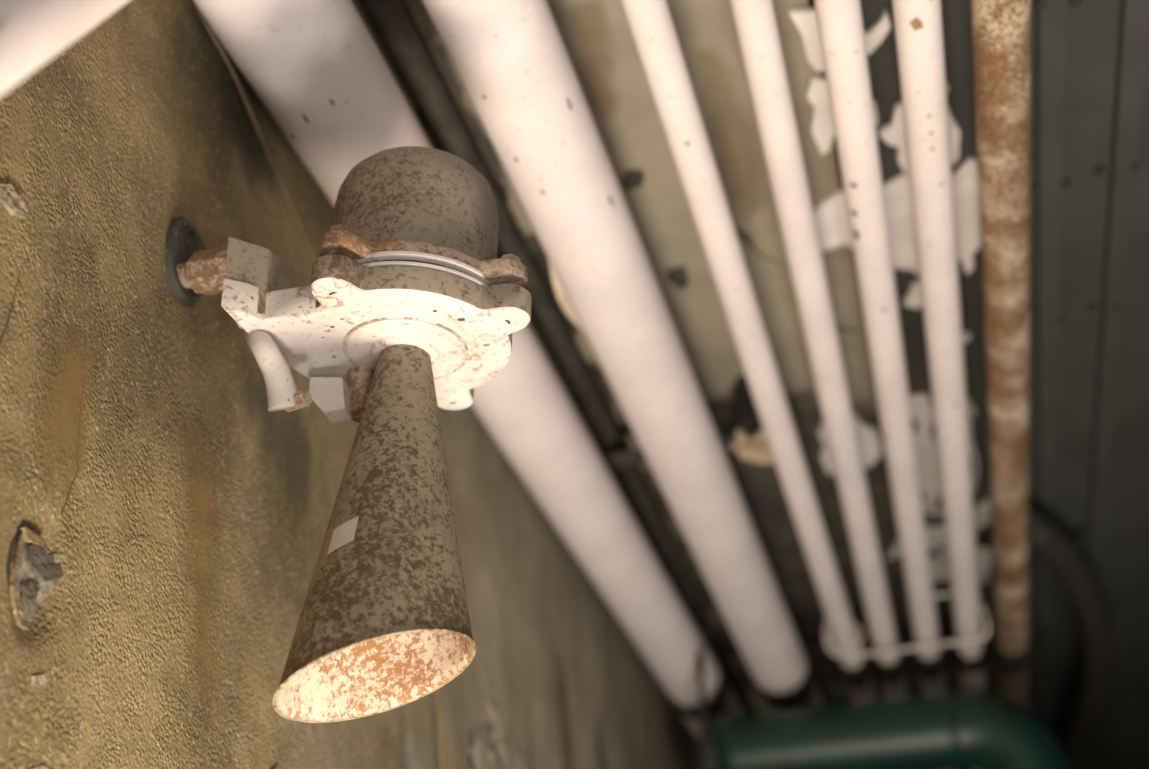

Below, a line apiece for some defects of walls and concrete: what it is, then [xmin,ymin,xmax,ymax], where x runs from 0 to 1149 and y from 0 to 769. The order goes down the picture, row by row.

peeling [789,7,835,155]
peeling [864,8,891,55]
peeling [909,17,923,32]
peeling [814,183,859,251]
peeling [873,100,923,309]
peeling [939,106,981,275]
spalling [6,521,63,632]
peeling [469,704,528,769]